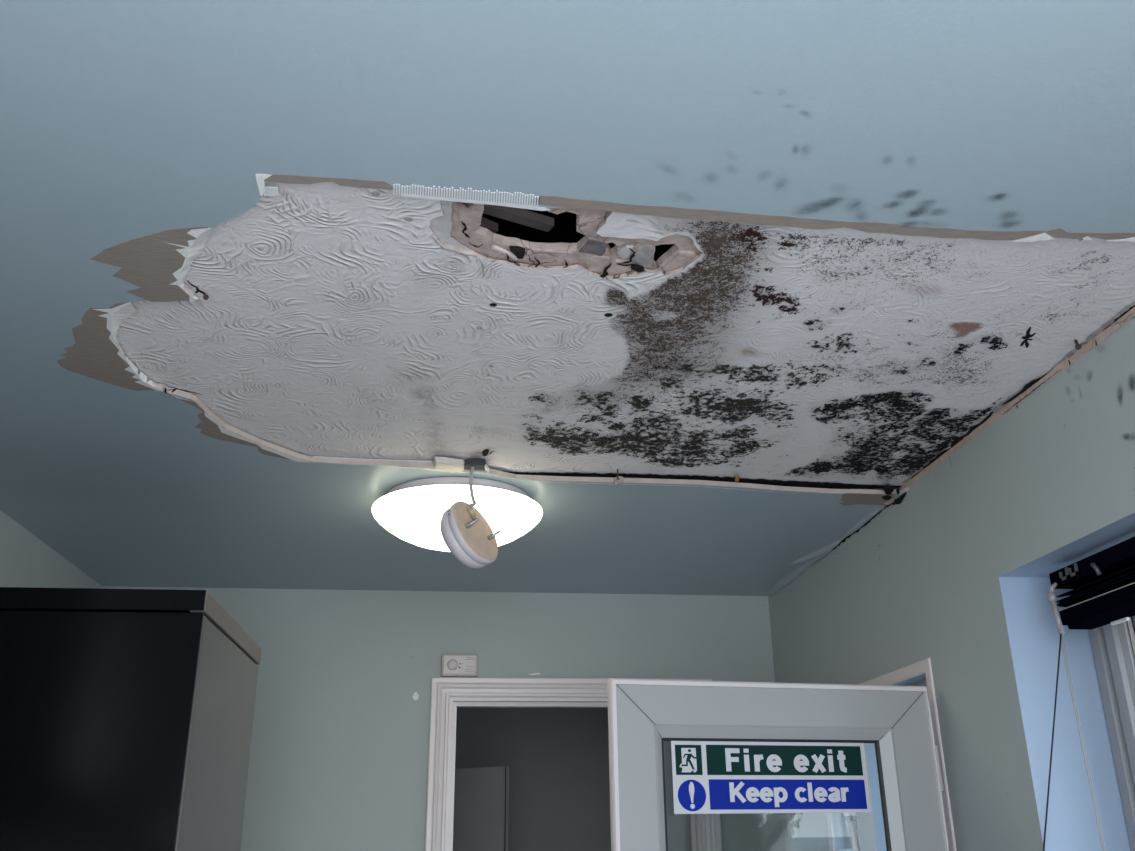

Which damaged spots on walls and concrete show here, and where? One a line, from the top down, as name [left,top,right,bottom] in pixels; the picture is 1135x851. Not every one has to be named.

peeling [256,174,271,196]
spalling [165,228,212,306]
peeling [1013,233,1054,242]
spalling [93,302,163,392]
damp [504,220,1133,489]
spalling [194,401,310,463]
flaking render [882,302,1135,507]